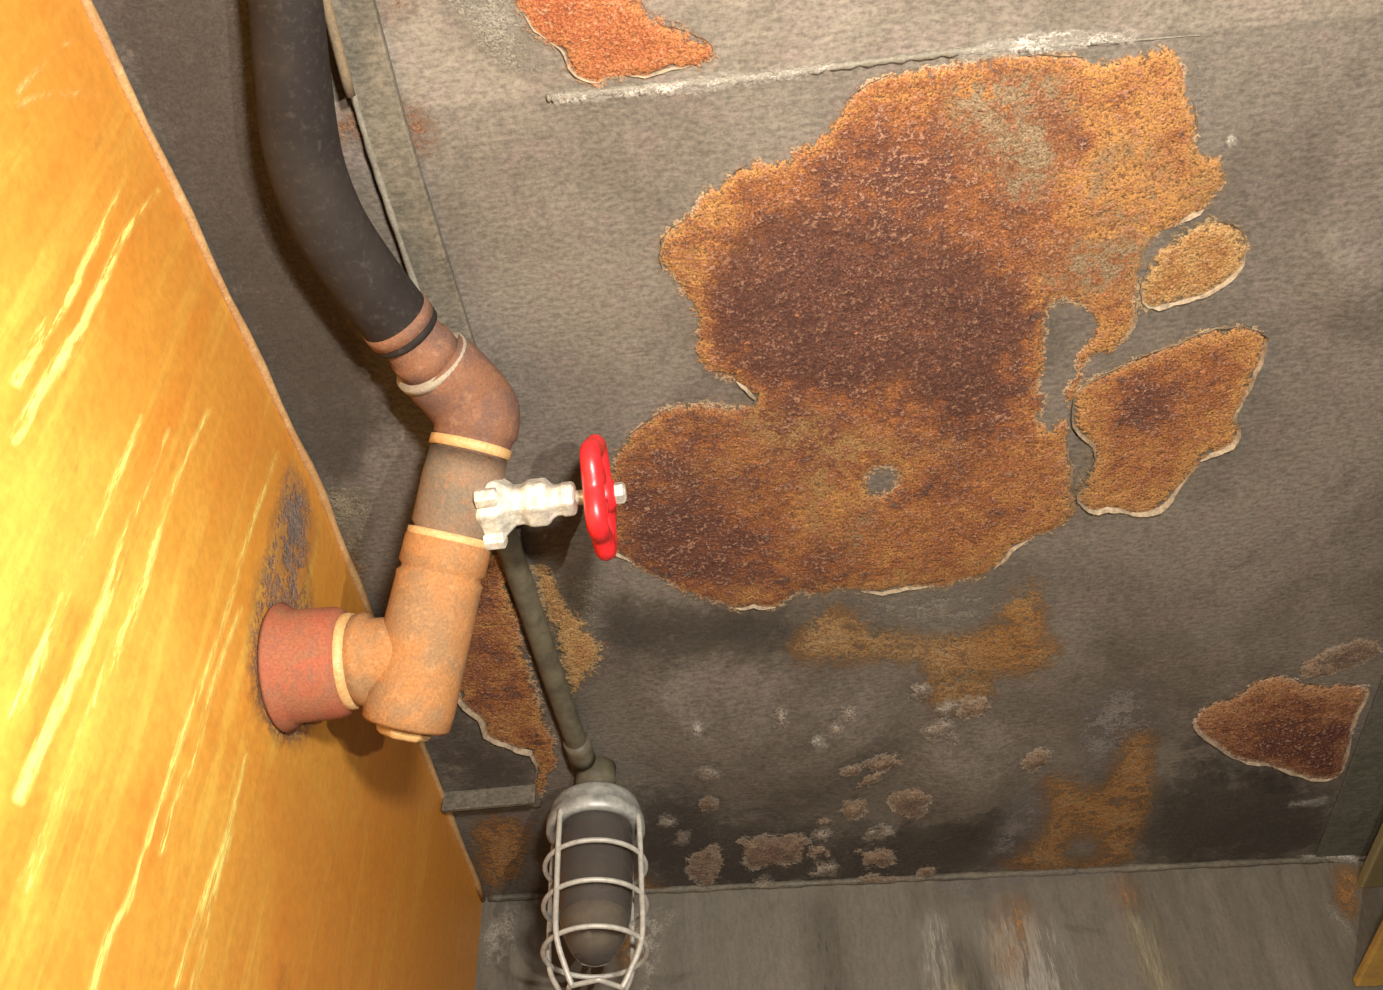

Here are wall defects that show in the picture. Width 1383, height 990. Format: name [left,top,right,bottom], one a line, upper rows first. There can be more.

corrosion [514,0,719,90]
corrosion [610,43,1269,747]
corrosion [458,553,561,799]
corrosion [529,560,607,698]
corrosion [1191,638,1383,782]
corrosion [659,753,936,890]